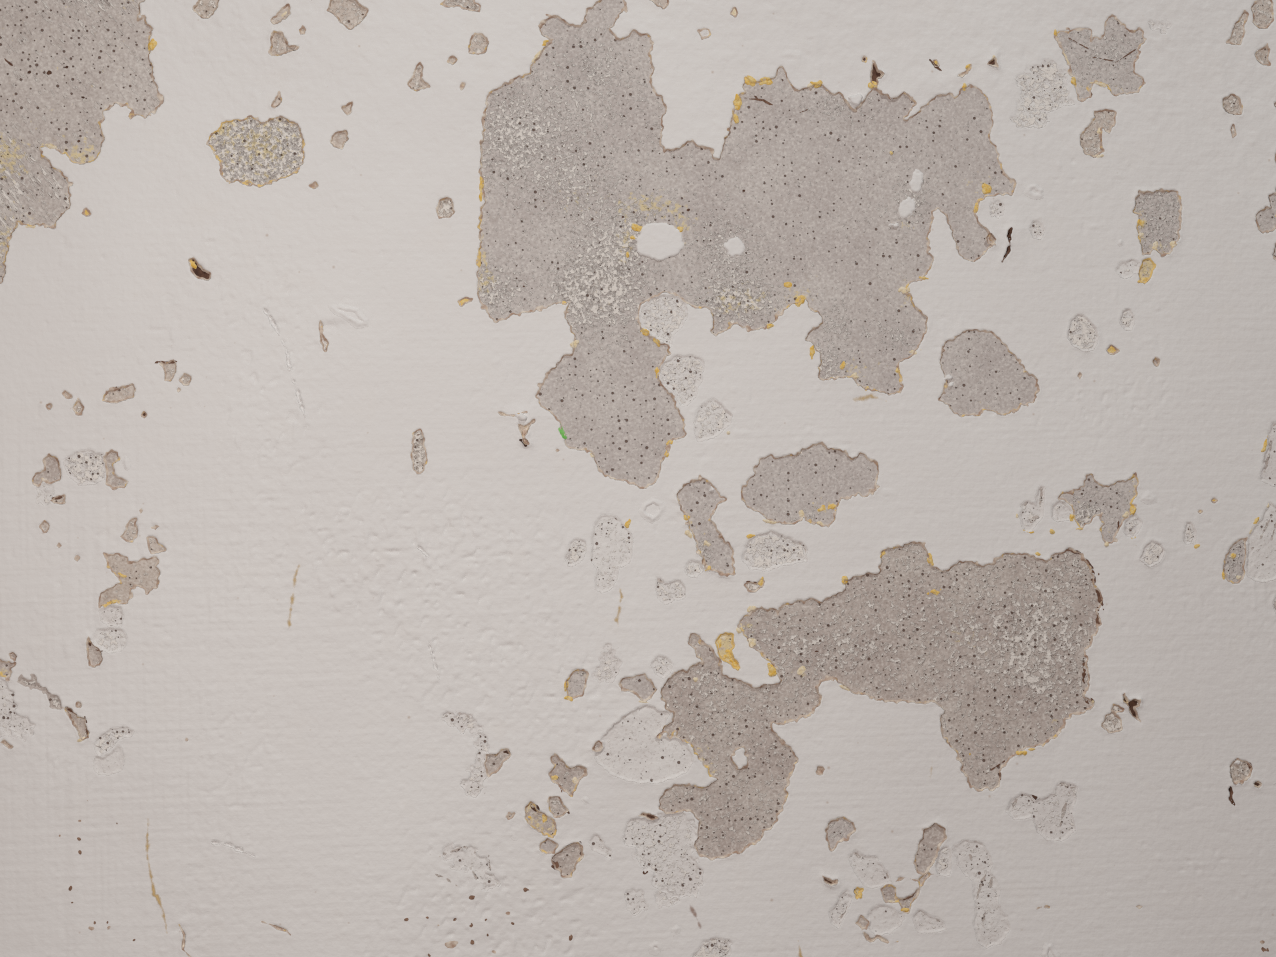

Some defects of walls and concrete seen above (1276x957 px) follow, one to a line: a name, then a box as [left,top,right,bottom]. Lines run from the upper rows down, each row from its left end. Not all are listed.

peeling [1010,14,1146,158]
peeling [0,0,164,283]
peeling [206,91,305,187]
peeling [458,0,1016,489]
peeling [1115,188,1182,284]
peeling [1256,192,1276,260]
peeling [938,329,1040,417]
peeling [1016,472,1165,567]
peeling [1222,502,1276,584]
spalling [0,652,134,756]
peeling [506,442,1104,915]
peeling [823,816,1010,948]